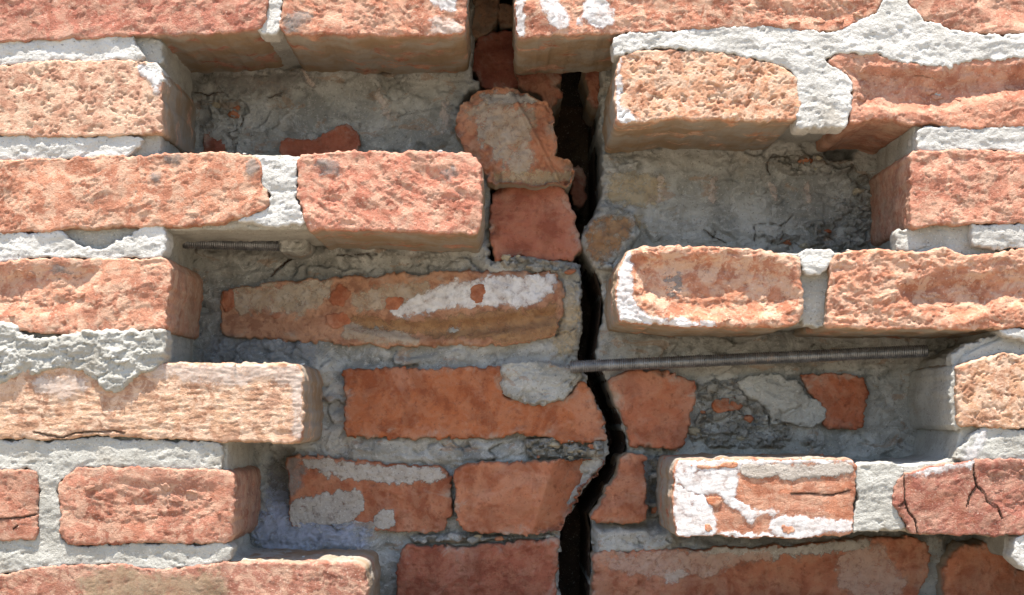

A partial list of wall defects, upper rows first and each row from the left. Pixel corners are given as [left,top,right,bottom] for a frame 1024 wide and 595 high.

spalling [197,94,247,148]
spalling [763,154,872,253]
spalling [501,254,578,277]
peeling [325,284,351,329]
peeling [385,296,404,310]
peeling [470,284,486,303]
crack [553,106,626,595]
spalling [688,373,827,469]
spalling [524,436,605,460]
peeling [706,496,722,508]
crack [967,461,1002,519]
spalling [406,532,556,545]